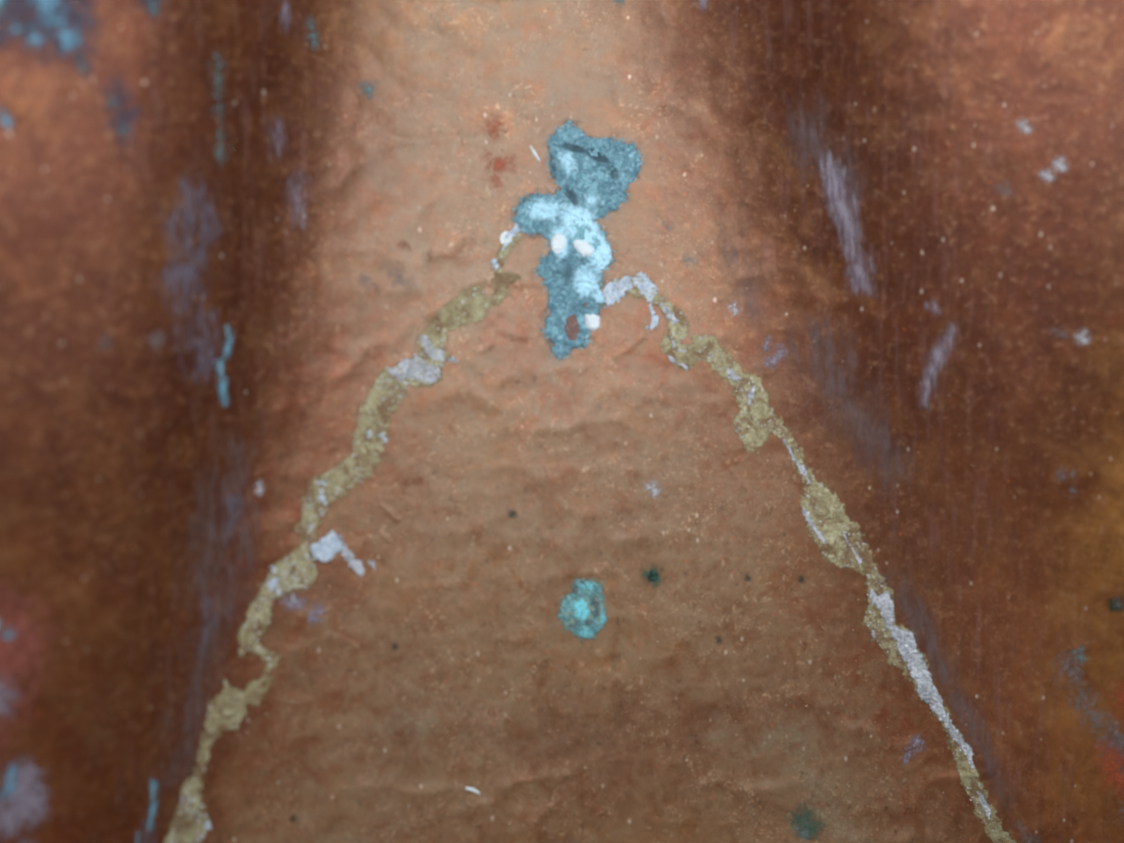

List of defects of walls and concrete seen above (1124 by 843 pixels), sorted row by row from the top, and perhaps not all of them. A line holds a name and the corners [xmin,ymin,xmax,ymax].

leakage [564,303,591,341]